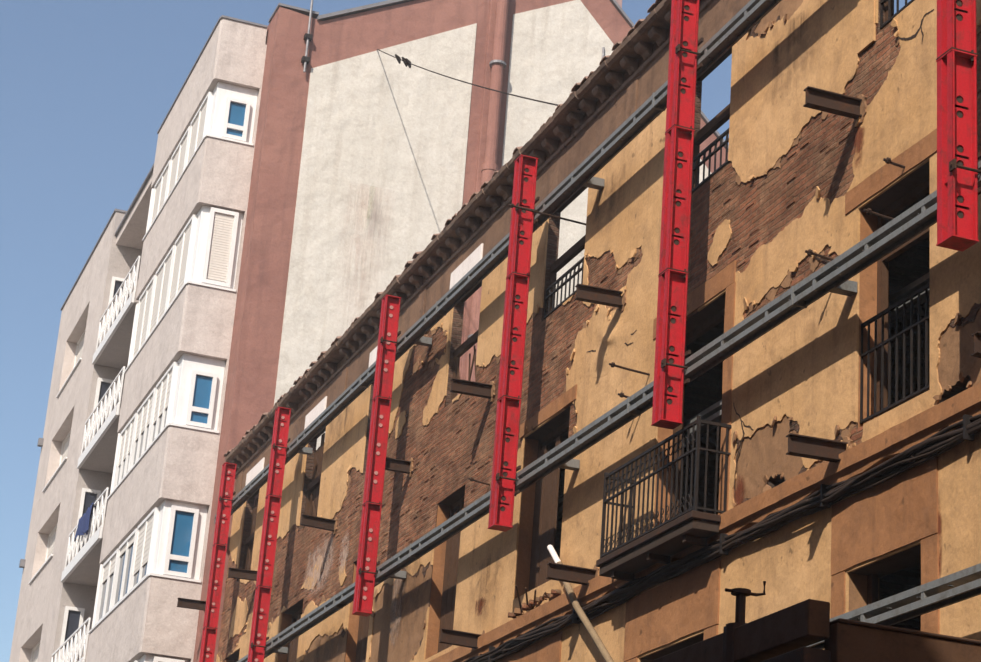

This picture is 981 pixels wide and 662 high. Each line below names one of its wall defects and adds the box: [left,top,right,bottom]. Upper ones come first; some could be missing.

spalling [844,19,901,106]
spalling [687,111,861,295]
spalling [584,247,643,296]
spalling [743,245,838,330]
spalling [518,294,619,450]
spalling [932,303,981,403]
spalling [376,323,501,567]
spalling [732,415,825,507]
spalling [834,421,863,449]
spalling [267,465,365,634]
spalling [369,563,432,662]